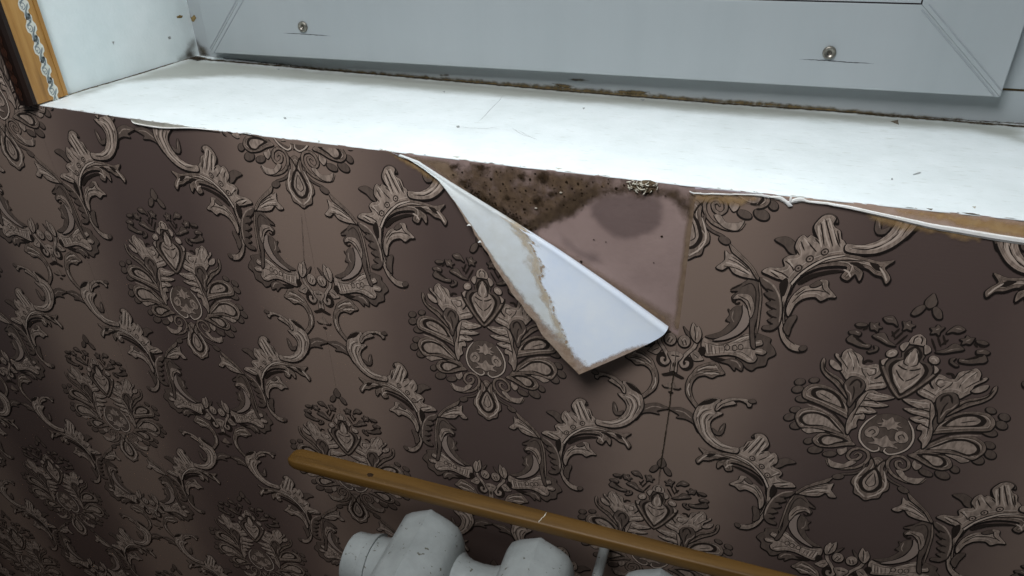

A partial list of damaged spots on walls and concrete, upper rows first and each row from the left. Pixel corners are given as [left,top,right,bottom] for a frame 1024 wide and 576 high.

spalling [627,179,658,195]
water stain [401,158,643,374]
water stain [600,192,696,329]